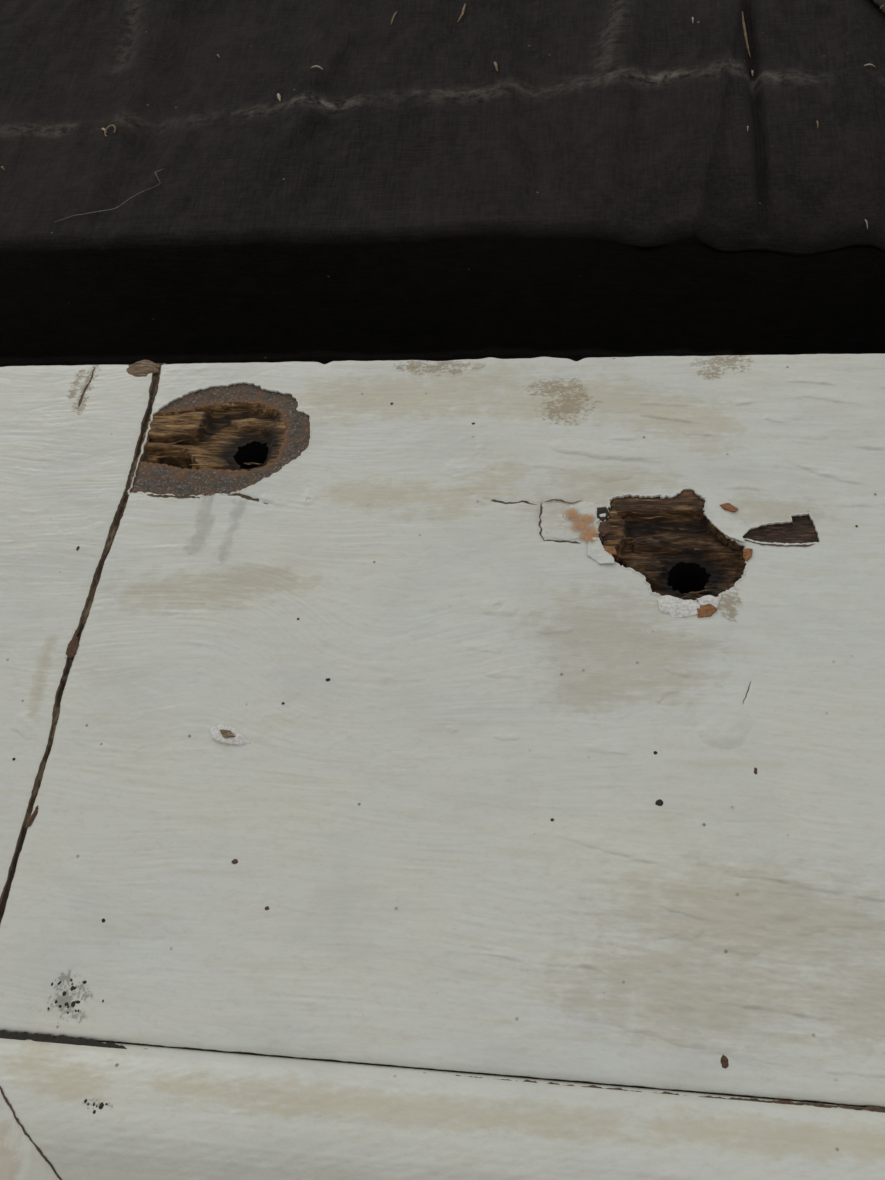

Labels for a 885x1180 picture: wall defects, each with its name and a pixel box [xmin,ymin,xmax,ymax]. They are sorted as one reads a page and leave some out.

peeling [126,381,313,497]
peeling [543,487,821,618]